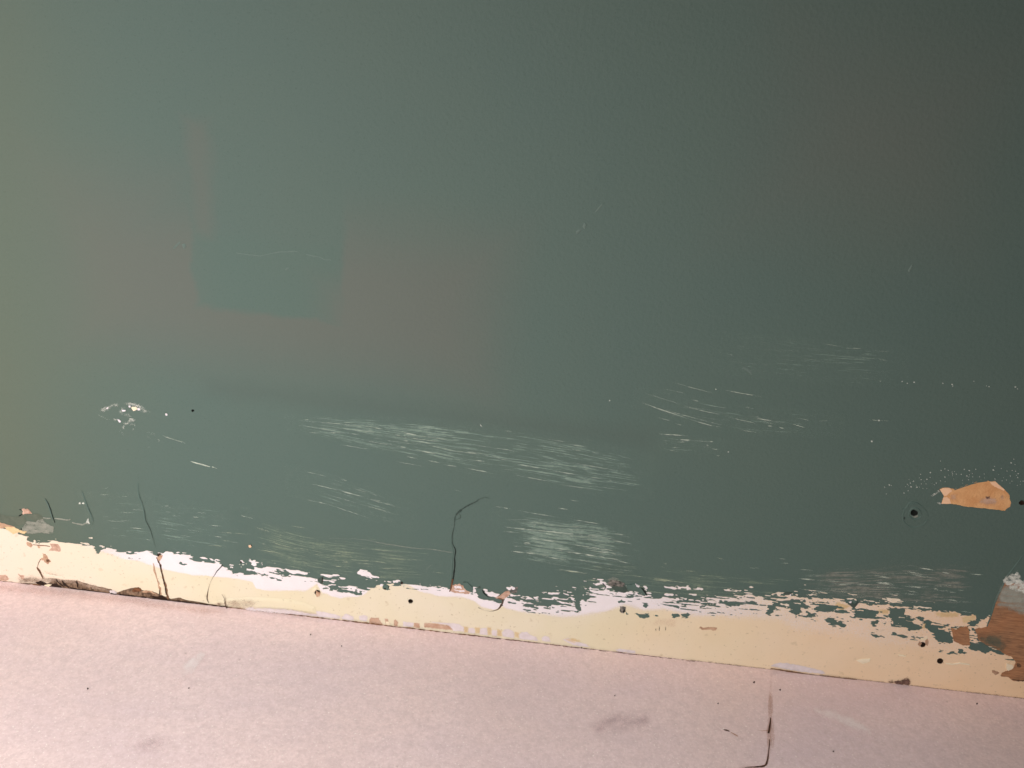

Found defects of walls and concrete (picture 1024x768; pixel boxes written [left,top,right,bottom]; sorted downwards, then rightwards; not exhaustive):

crack [137,483,169,600]
crack [448,497,487,592]
peeling [0,508,1024,698]
peeling [933,480,1011,512]